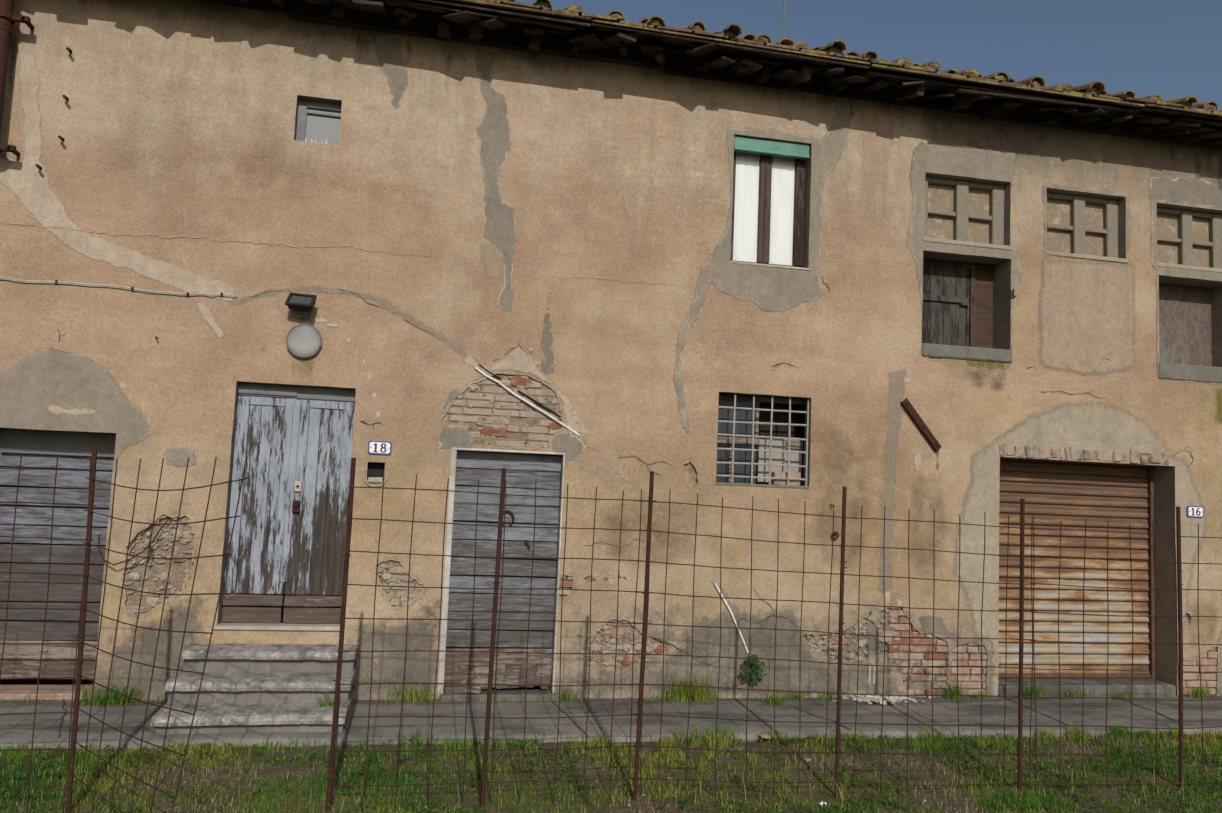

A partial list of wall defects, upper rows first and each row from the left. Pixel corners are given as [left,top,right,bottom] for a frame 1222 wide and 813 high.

flaking render [441,347,589,451]
flaking render [120,513,198,621]
flaking render [374,558,426,610]
flaking render [580,617,673,675]
flaking render [801,591,989,697]
flaking render [1183,645,1219,696]